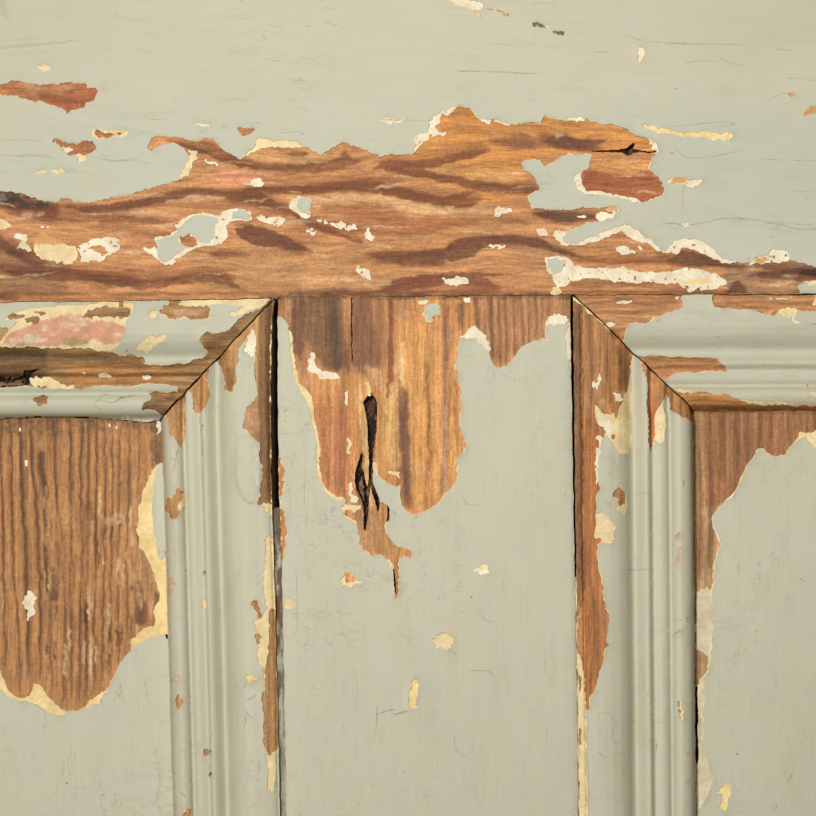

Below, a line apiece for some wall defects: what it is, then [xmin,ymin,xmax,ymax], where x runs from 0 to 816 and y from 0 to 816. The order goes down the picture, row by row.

peeling [0,80,98,114]
peeling [0,105,816,601]
peeling [0,417,186,715]
peeling [246,536,279,793]
peeling [408,678,419,709]
peeling [432,633,454,650]
peeling [572,297,634,816]
peeling [639,355,816,812]